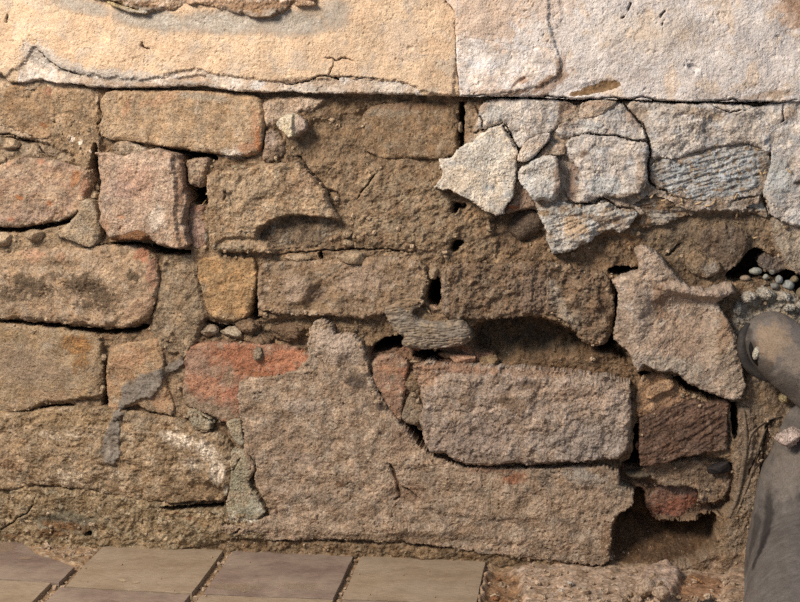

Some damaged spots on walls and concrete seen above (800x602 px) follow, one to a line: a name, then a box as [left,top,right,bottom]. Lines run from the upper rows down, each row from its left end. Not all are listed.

crack [281,58,377,85]
crack [465,94,797,201]
crack [568,198,639,214]
spalling [612,487,718,564]